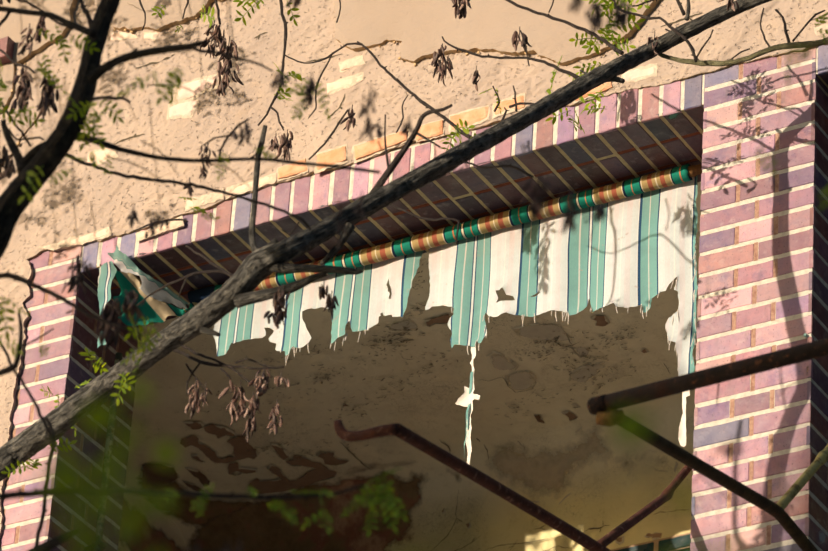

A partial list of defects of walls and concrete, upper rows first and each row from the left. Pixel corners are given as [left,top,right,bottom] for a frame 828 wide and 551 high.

peeling [110,0,225,41]
flaking render [167,74,223,120]
peeling [326,0,660,95]
flaking render [573,63,658,103]
flaking render [135,93,526,242]
flaking render [39,227,111,251]
peeling [257,260,459,414]
peeling [486,314,650,425]
peeling [140,407,349,494]